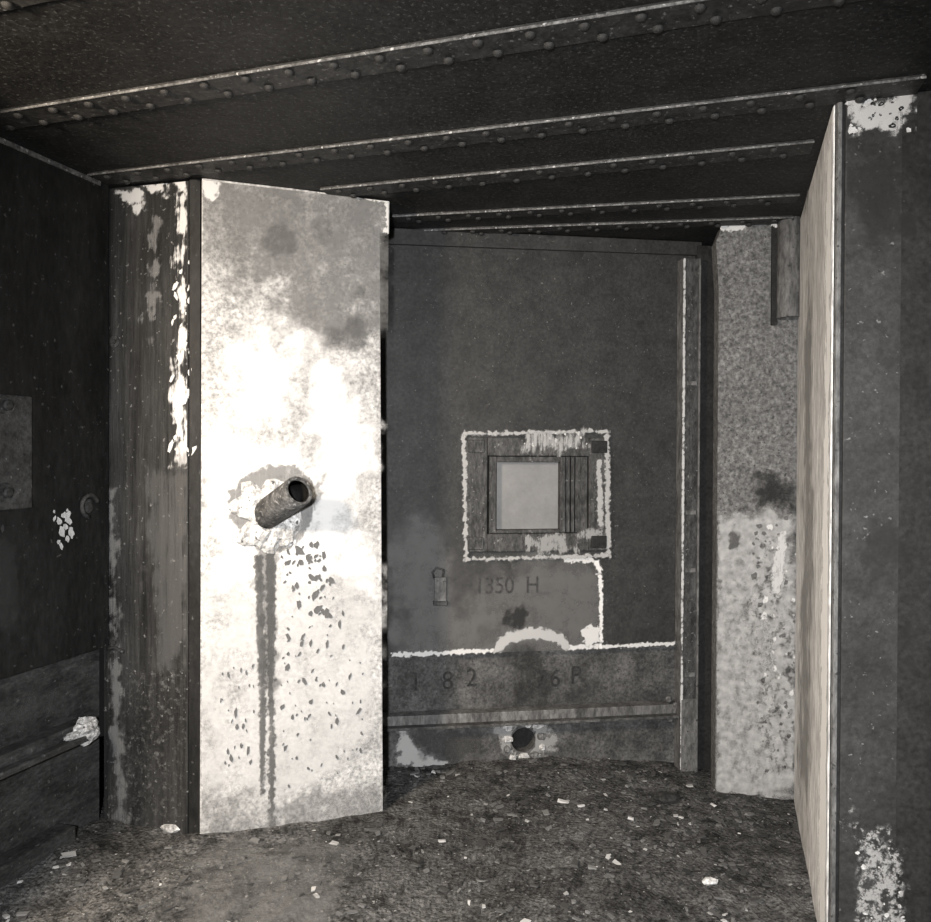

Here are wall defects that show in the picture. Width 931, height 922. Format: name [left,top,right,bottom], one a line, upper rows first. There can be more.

peeling [845,95,917,140]
peeling [115,181,197,466]
peeling [53,509,75,550]
peeling [391,258,686,703]
water stain [729,532,740,549]
water stain [756,472,795,509]
water stain [797,309,813,799]
corrosion [227,464,320,827]
peeling [854,828,905,922]